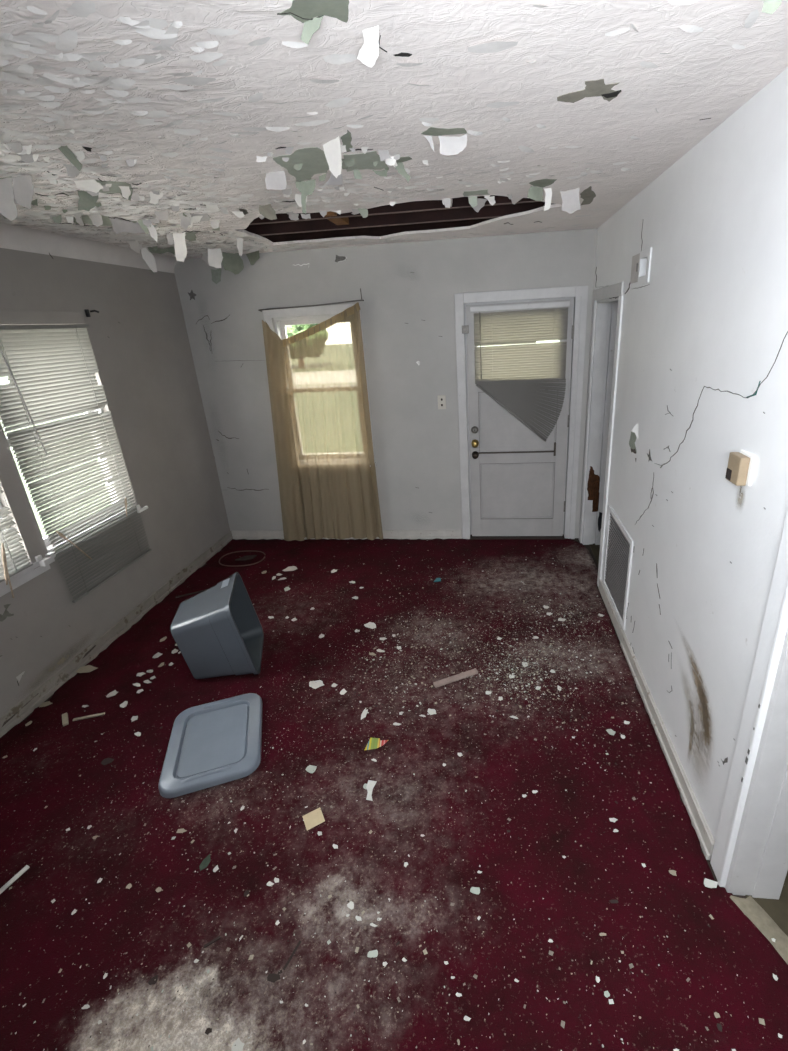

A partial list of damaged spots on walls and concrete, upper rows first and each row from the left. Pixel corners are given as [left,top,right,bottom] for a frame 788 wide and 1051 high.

peeling [0,0,631,284]
crack [636,331,788,523]
damp [689,662,711,750]